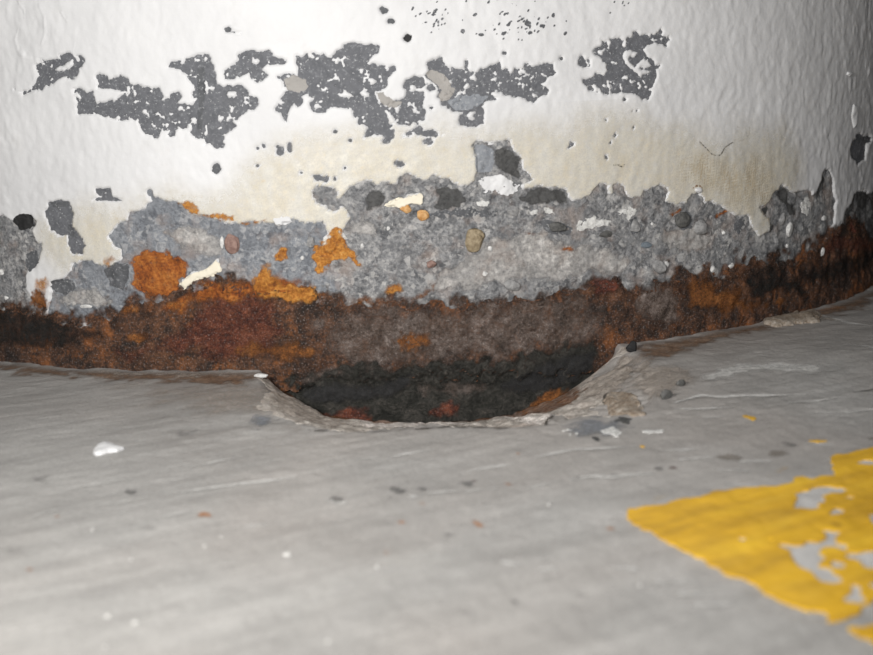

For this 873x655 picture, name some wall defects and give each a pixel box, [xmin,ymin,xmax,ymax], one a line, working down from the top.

peeling [476,1,567,41]
peeling [23,42,563,149]
peeling [578,29,670,101]
peeling [850,134,871,166]
spalling [0,140,873,323]
corrosion [0,216,873,423]
peeling [794,487,853,509]
peeling [779,531,873,609]